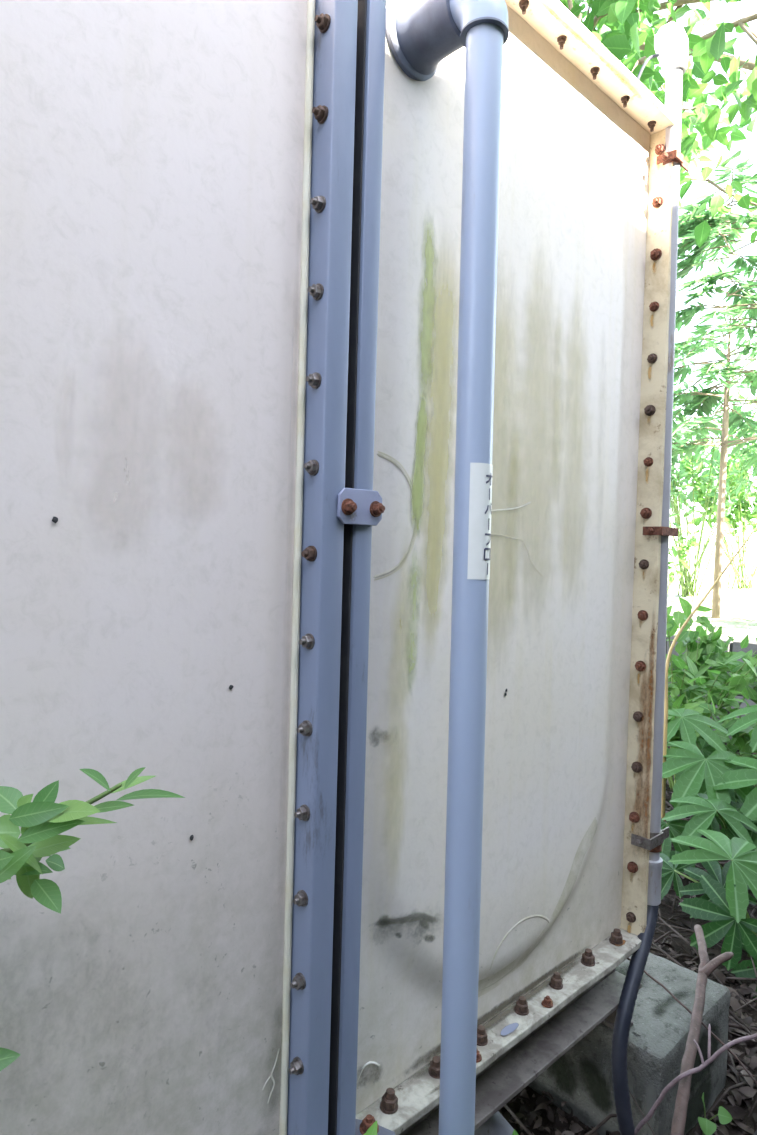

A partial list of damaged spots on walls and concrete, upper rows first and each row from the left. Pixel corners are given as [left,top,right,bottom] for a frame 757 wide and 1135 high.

water stain [412,233,451,608]
rust [632,629,654,837]
water stain [380,913,436,941]